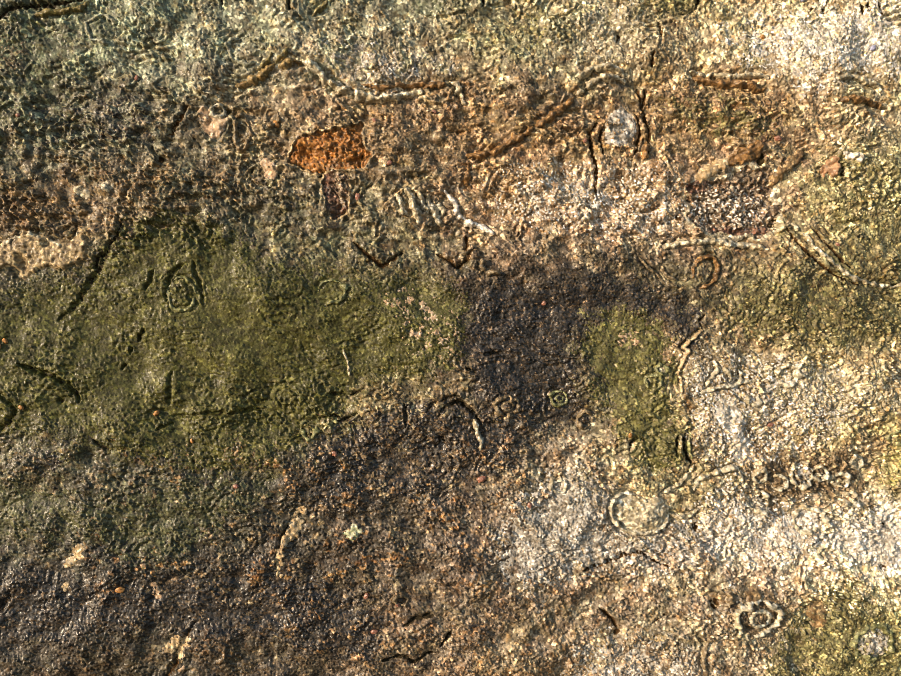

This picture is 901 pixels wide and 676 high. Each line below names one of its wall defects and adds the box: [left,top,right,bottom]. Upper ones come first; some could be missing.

crack [588,121,608,200]
water stain [481,157,775,245]
water stain [0,253,901,676]